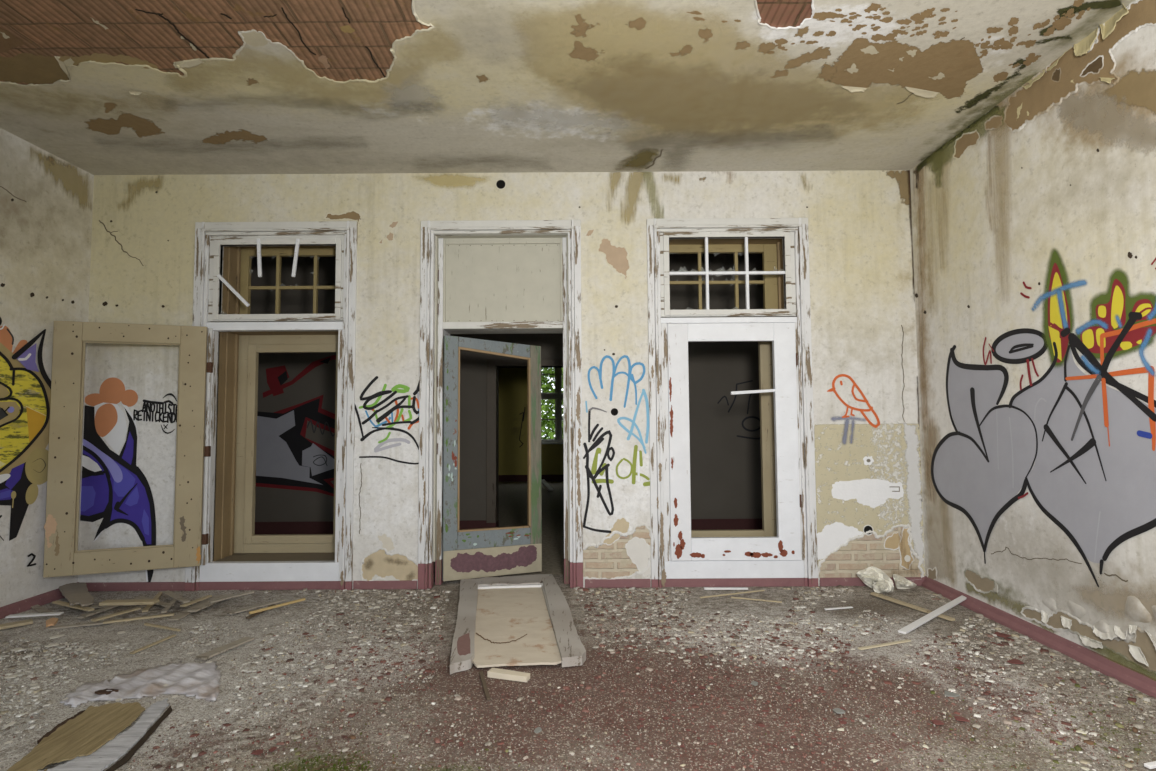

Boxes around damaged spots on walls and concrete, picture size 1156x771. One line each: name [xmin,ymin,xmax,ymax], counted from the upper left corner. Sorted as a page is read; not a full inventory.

peeling [85,103,165,138]
spalling [0,0,436,88]
peeling [669,11,741,57]
peeling [735,0,1156,159]
leakage [886,58,1035,205]
leakage [1035,0,1122,45]
peeling [585,229,631,280]
peeling [651,365,673,442]
spalling [359,533,418,582]
peeling [571,390,582,532]
spalling [583,496,705,588]
spalling [745,422,937,581]